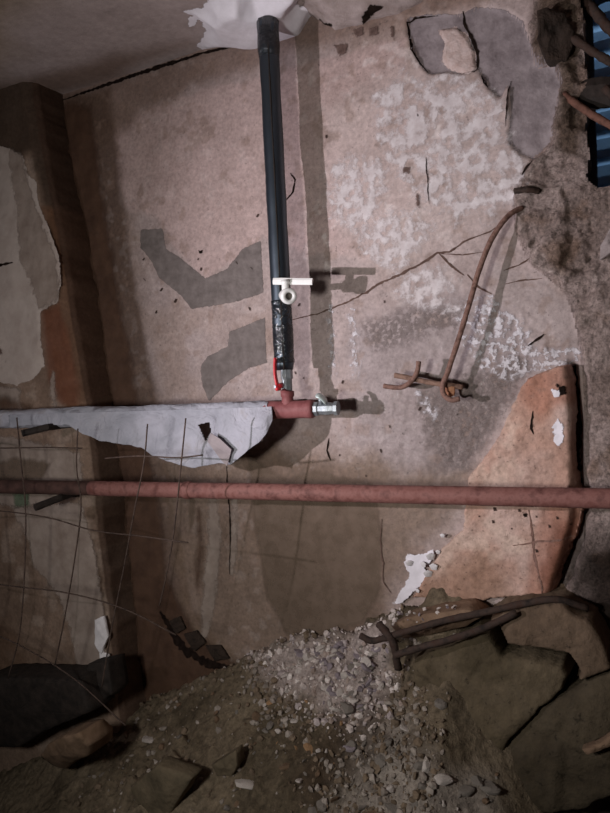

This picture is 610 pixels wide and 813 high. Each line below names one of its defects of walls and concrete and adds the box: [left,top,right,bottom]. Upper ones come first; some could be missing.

flaking render [0,146,61,386]
spalling [183,0,610,488]
crack [293,228,542,320]
flaking render [0,436,83,481]
flaking render [0,493,110,665]
spalling [359,508,610,644]